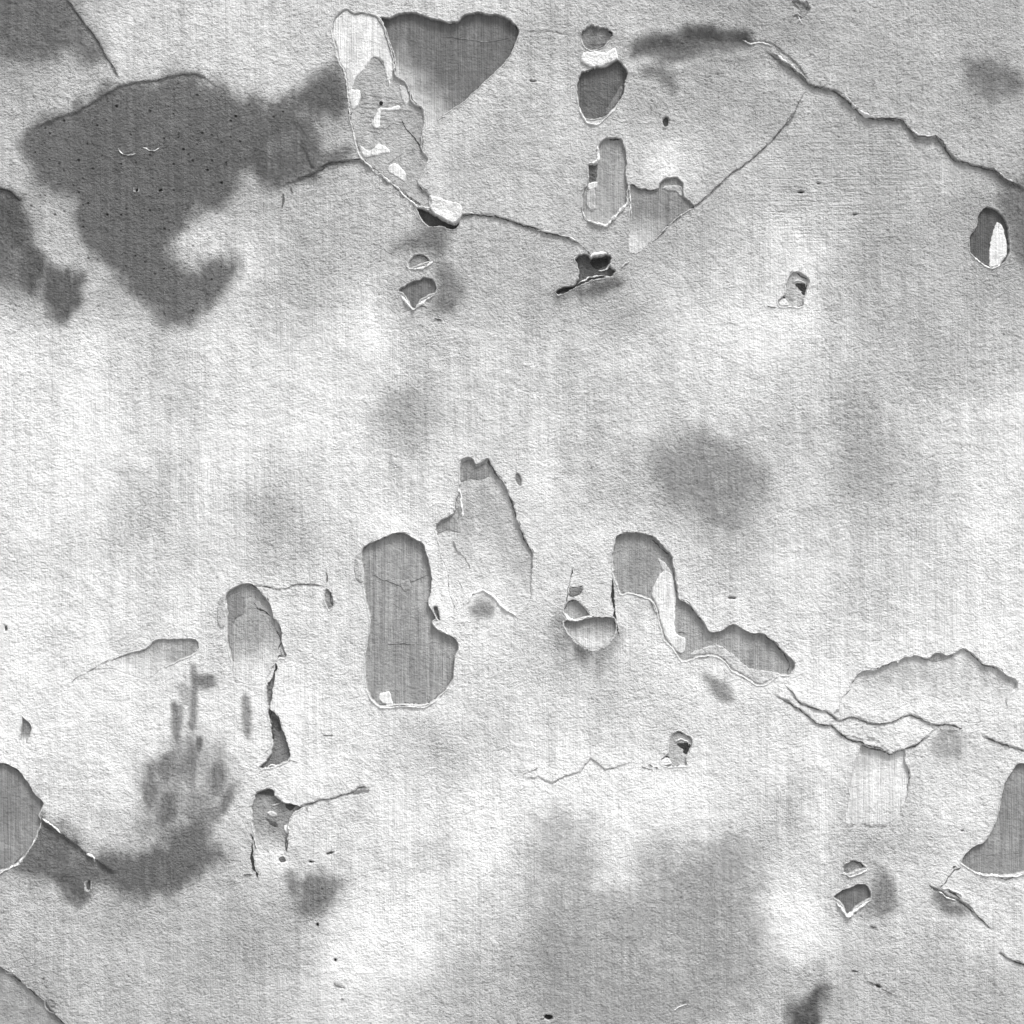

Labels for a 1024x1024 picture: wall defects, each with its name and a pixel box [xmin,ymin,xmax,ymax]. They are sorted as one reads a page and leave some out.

water stain [0,189,83,321]
water stain [24,68,351,324]
spalling [330,8,521,231]
spalling [575,23,629,126]
spalling [555,136,695,296]
crack [661,16,1014,235]
peeling [217,582,296,771]
peeling [354,456,534,709]
peeling [562,531,796,686]
peeling [0,762,44,874]
water stain [19,666,232,896]
peeling [960,762,1024,880]